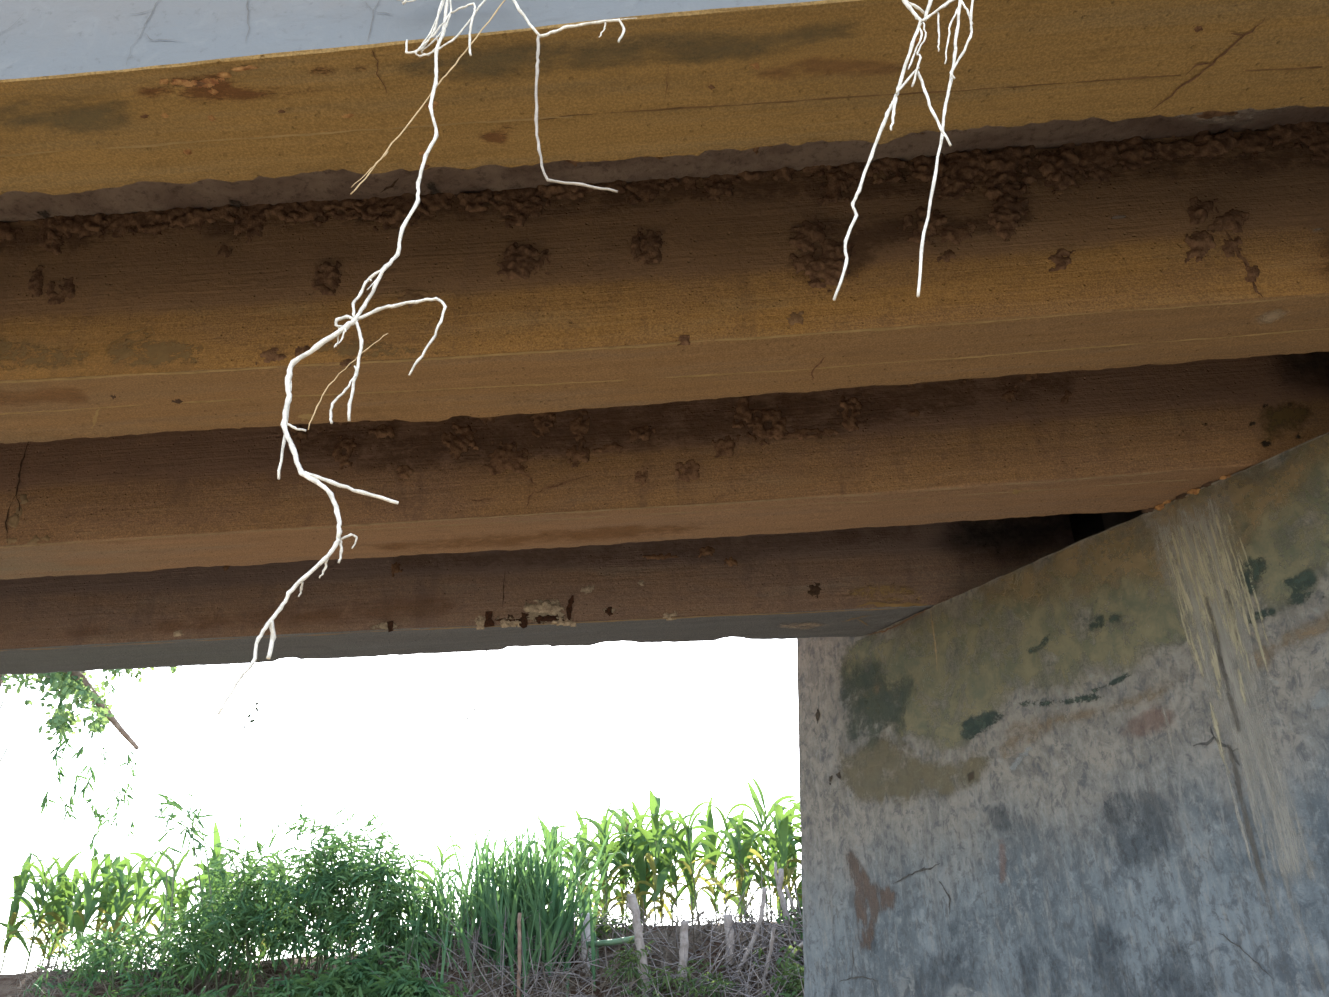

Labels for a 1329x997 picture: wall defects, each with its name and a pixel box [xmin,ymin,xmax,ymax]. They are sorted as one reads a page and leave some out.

crack [5,442,51,546]
water stain [951,513,1104,557]
spalling [474,585,595,630]
water stain [841,738,987,801]
rust [846,852,897,949]